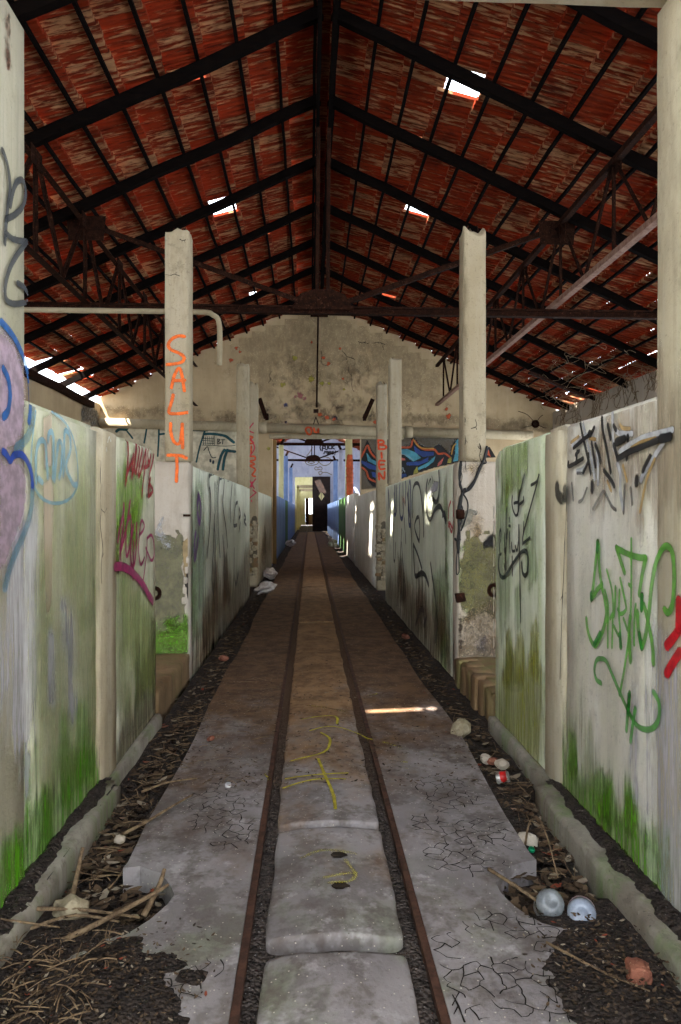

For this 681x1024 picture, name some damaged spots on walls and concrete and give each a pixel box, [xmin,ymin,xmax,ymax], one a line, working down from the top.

flaking render [155,530,190,654]
flaking render [459,506,496,648]
crack [189,777,259,849]
crack [411,773,514,877]
damp [646,666,681,912]
crack [431,911,582,1023]